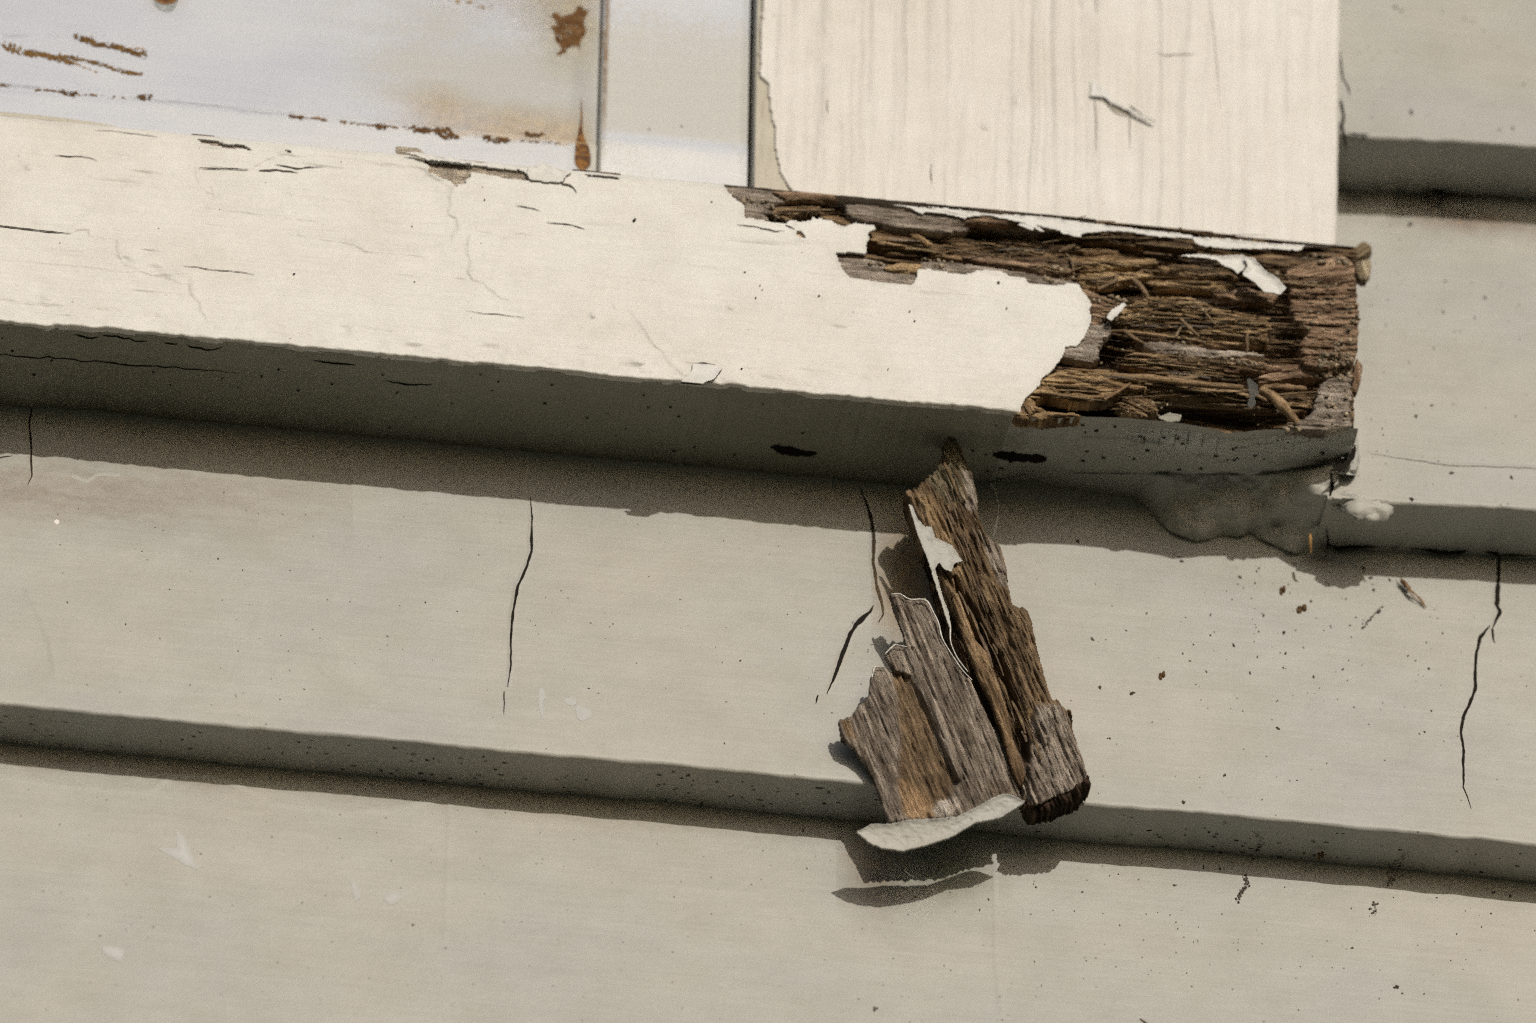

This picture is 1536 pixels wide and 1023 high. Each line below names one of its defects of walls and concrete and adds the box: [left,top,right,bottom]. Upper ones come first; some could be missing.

corrosion [2,34,148,75]
corrosion [551,0,609,101]
corrosion [35,88,153,100]
corrosion [288,114,461,140]
corrosion [483,102,591,170]
peeling [894,205,1304,295]
peeling [1106,303,1126,321]
crack [0,408,36,486]
peeling [1158,412,1182,423]
crack [503,496,536,711]
crack [816,488,887,703]
crack [1460,556,1505,807]